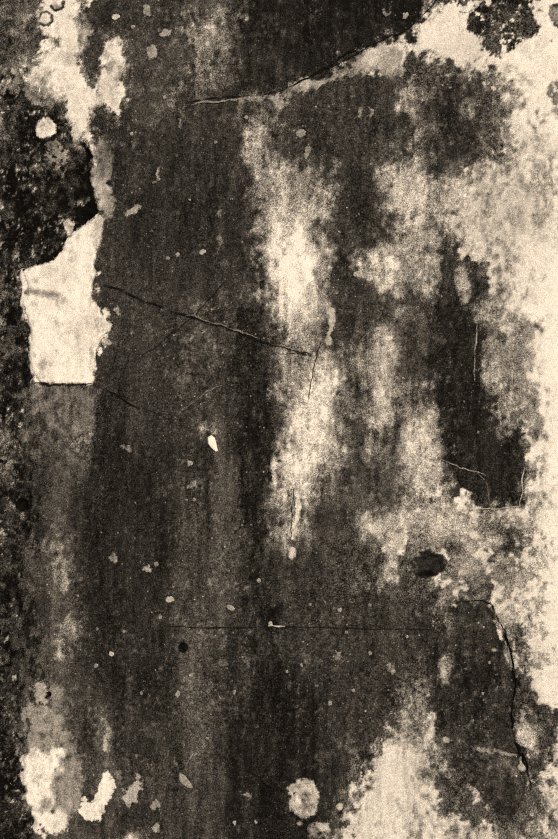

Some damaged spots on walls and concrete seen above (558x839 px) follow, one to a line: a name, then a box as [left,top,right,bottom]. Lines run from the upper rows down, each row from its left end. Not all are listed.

crack [186,0,437,105]
leakage [67,105,100,149]
leakage [519,138,558,227]
leakage [473,191,511,238]
leakage [496,236,524,275]
leakage [509,312,544,364]
leakage [30,380,61,403]
spalling [0,0,129,839]
leakage [529,498,543,517]
leakage [418,595,558,839]
crack [466,600,532,790]
leakage [352,777,375,801]